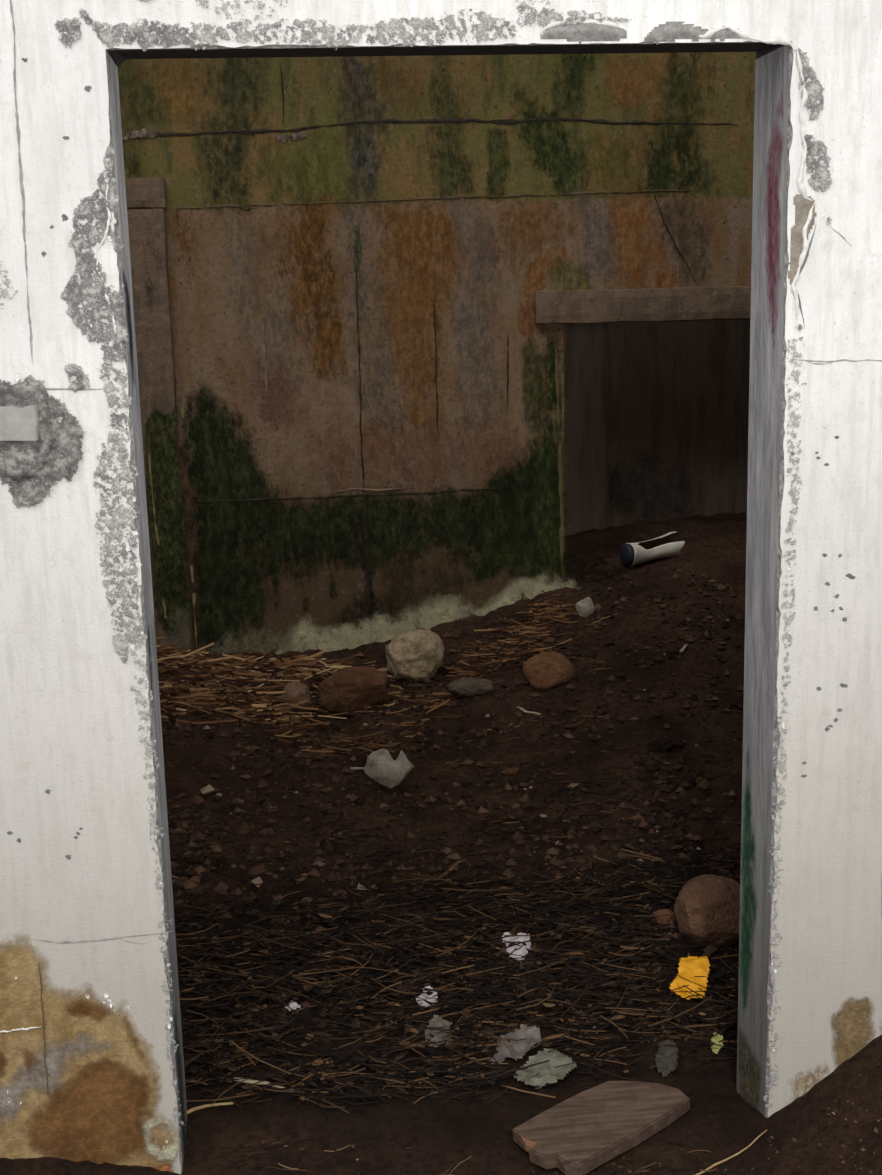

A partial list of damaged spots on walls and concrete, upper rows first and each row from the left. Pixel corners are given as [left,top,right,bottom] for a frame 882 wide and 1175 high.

peeling [55,0,631,51]
corrosion [279,195,345,378]
damp [339,56,385,320]
crack [794,358,882,366]
spalling [0,145,184,1132]
damp [212,452,576,655]
spalling [763,47,833,1107]
crack [32,931,171,1095]